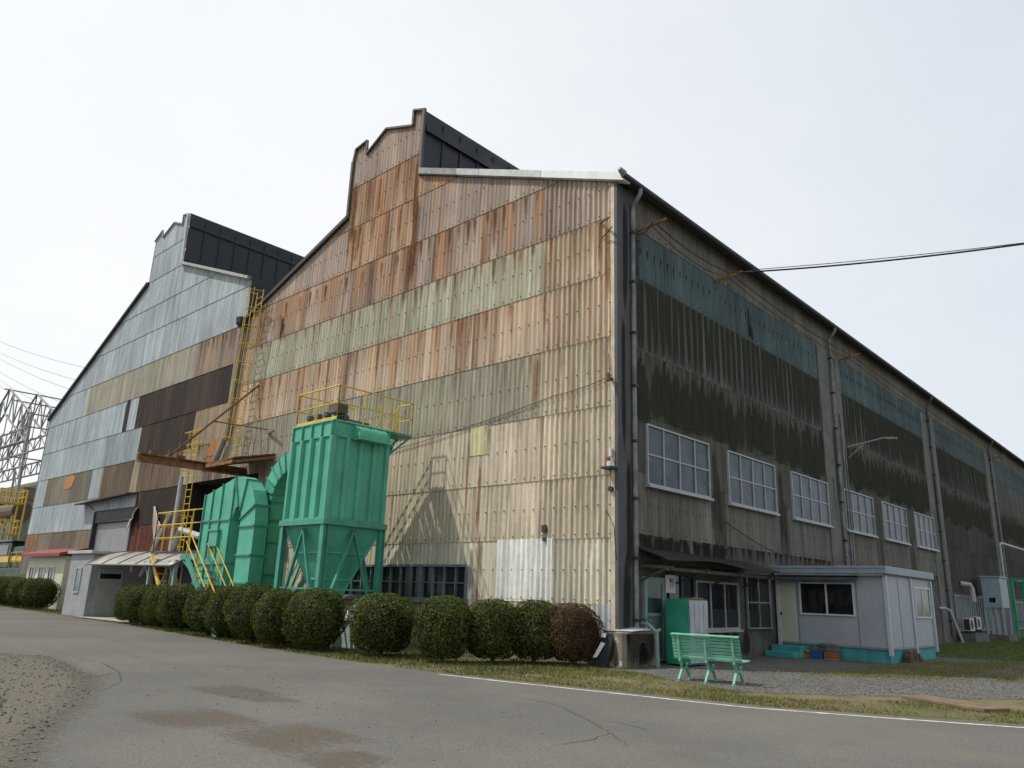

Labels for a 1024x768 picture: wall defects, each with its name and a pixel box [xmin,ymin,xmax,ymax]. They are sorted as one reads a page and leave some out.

corrosion [345,157,537,313]
corrosion [588,213,611,346]
leakage [610,206,1024,666]
corrosion [465,443,492,603]